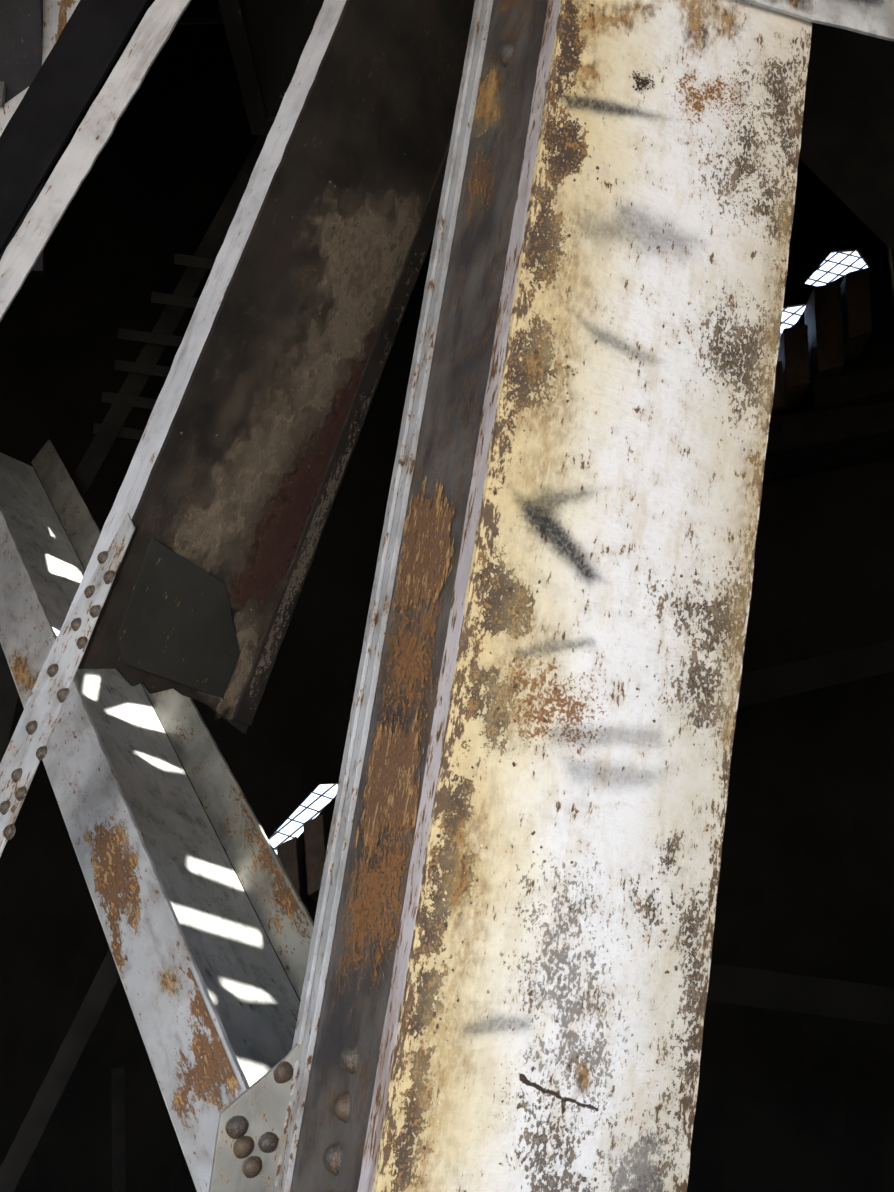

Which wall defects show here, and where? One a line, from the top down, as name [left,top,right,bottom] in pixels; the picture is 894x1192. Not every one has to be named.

corrosion [581,1,651,41]
corrosion [681,0,735,50]
corrosion [580,63,600,102]
corrosion [674,67,748,132]
corrosion [371,575,445,753]
corrosion [495,601,608,764]
corrosion [83,811,141,974]
corrosion [161,948,241,1128]
crack [519,1073,598,1113]